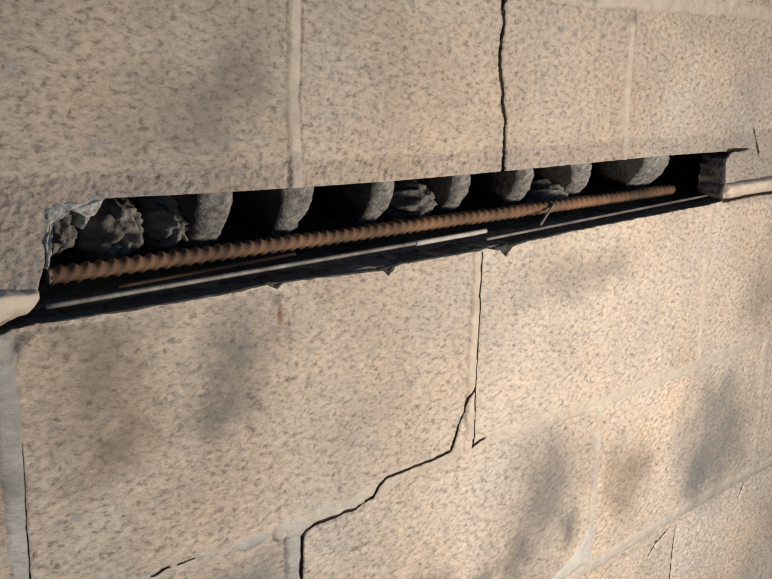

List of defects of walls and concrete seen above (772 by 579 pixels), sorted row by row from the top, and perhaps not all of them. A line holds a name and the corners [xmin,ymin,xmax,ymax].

crack [498,0,507,172]
spalling [252,277,281,289]
spalling [43,184,676,287]
crack [299,252,486,579]
crack [150,558,196,577]